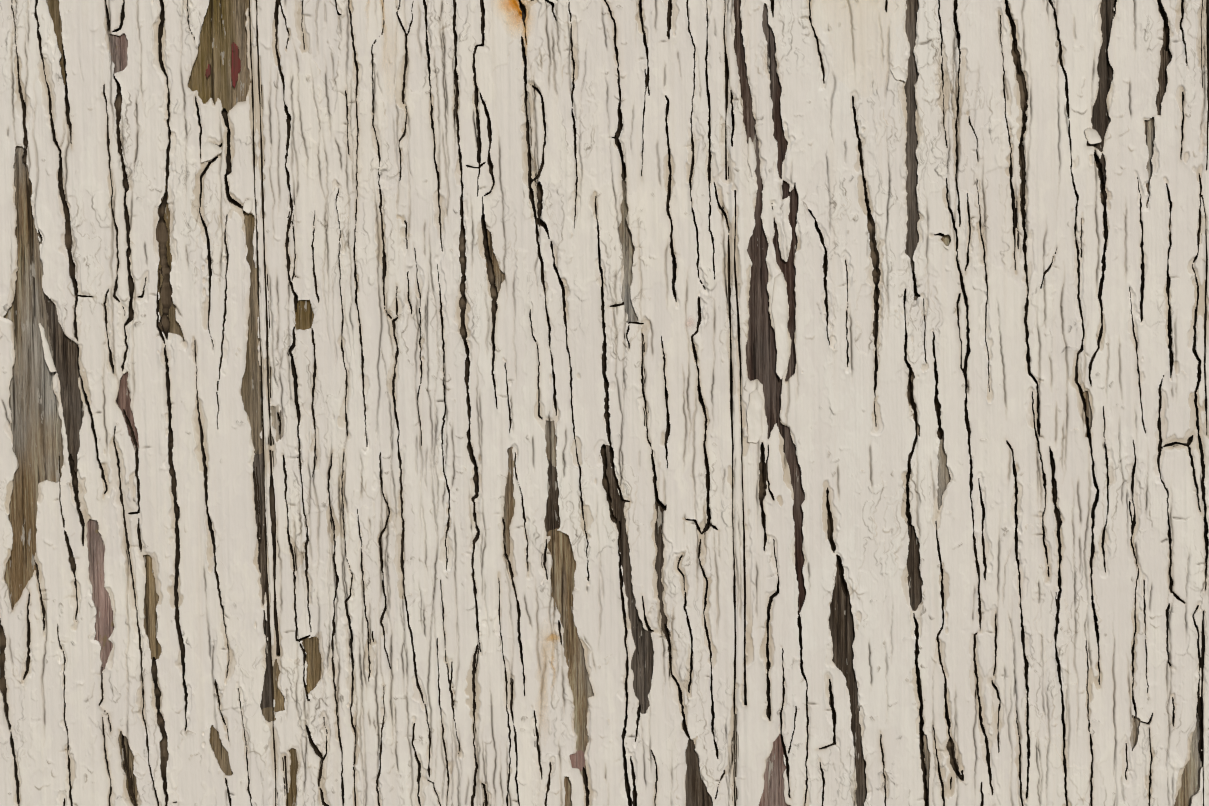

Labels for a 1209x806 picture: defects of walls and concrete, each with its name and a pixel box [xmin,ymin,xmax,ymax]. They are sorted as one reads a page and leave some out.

peeling [4,146,114,674]
peeling [188,0,252,112]
peeling [241,211,285,722]
crack [253,0,735,806]
rust [507,0,522,19]
peeling [544,418,594,806]
peeling [602,444,671,714]
peeling [734,0,806,613]
crack [759,442,836,806]
peeling [829,551,867,806]
peeling [891,0,920,300]
crack [808,0,1208,806]